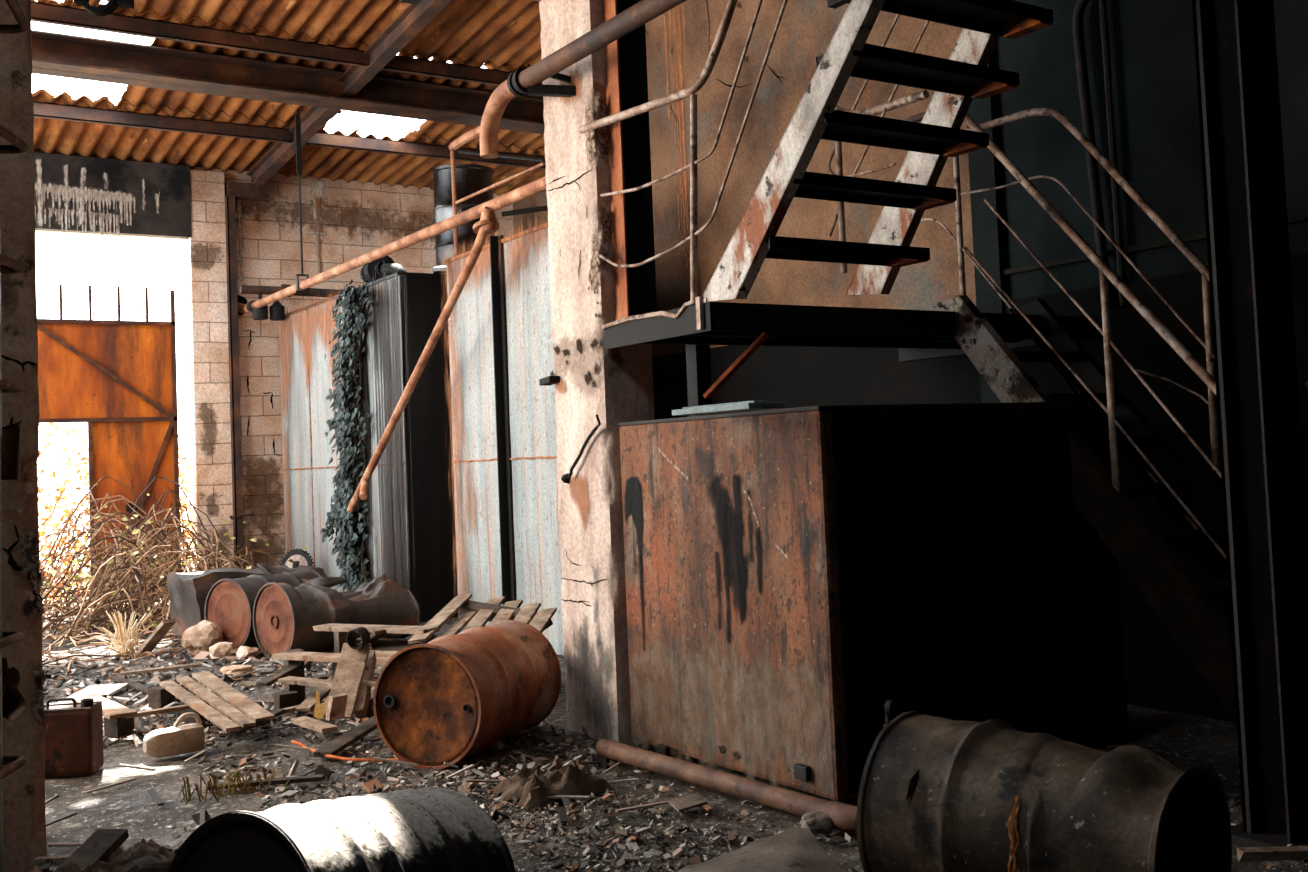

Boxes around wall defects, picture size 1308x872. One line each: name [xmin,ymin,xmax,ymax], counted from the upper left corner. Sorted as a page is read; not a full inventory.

damp [35,159,159,243]
rust [279,294,339,416]
rust [445,222,544,595]
damp [632,518,644,650]
damp [714,475,753,642]